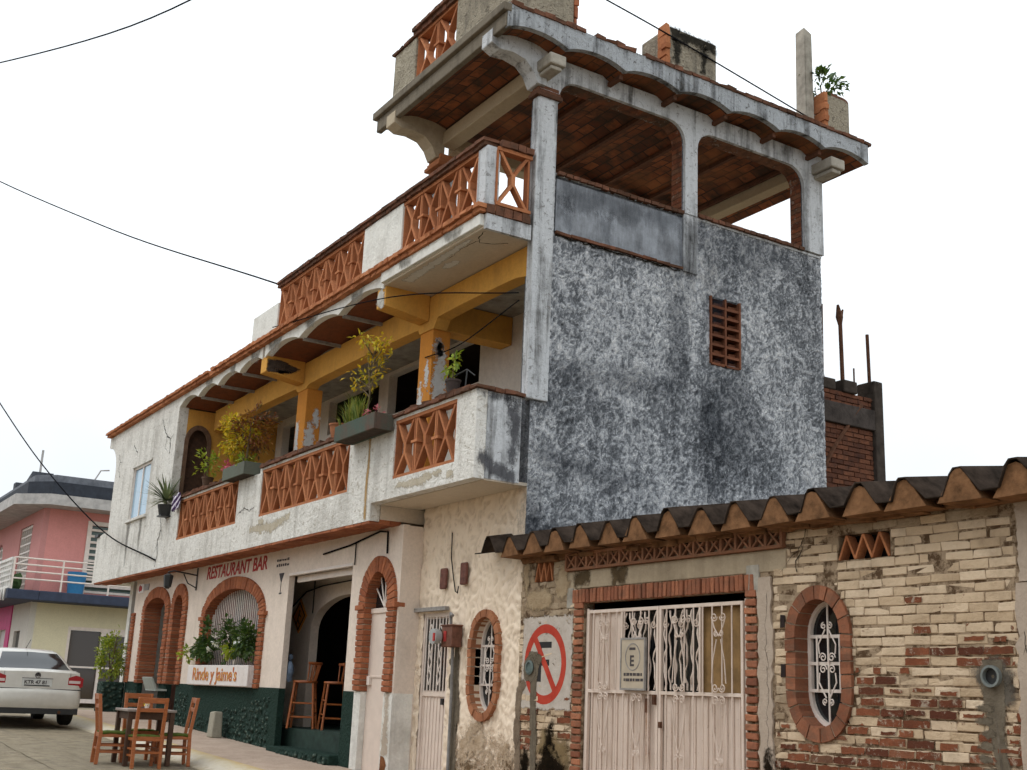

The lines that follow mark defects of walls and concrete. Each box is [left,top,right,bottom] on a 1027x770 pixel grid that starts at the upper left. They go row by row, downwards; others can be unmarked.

peeling [416,337,449,405]
flaking render [523,563,571,612]
flaking render [913,626,931,634]
flaking render [775,636,1023,770]
water stain [975,656,1016,706]
water stain [520,720,570,770]